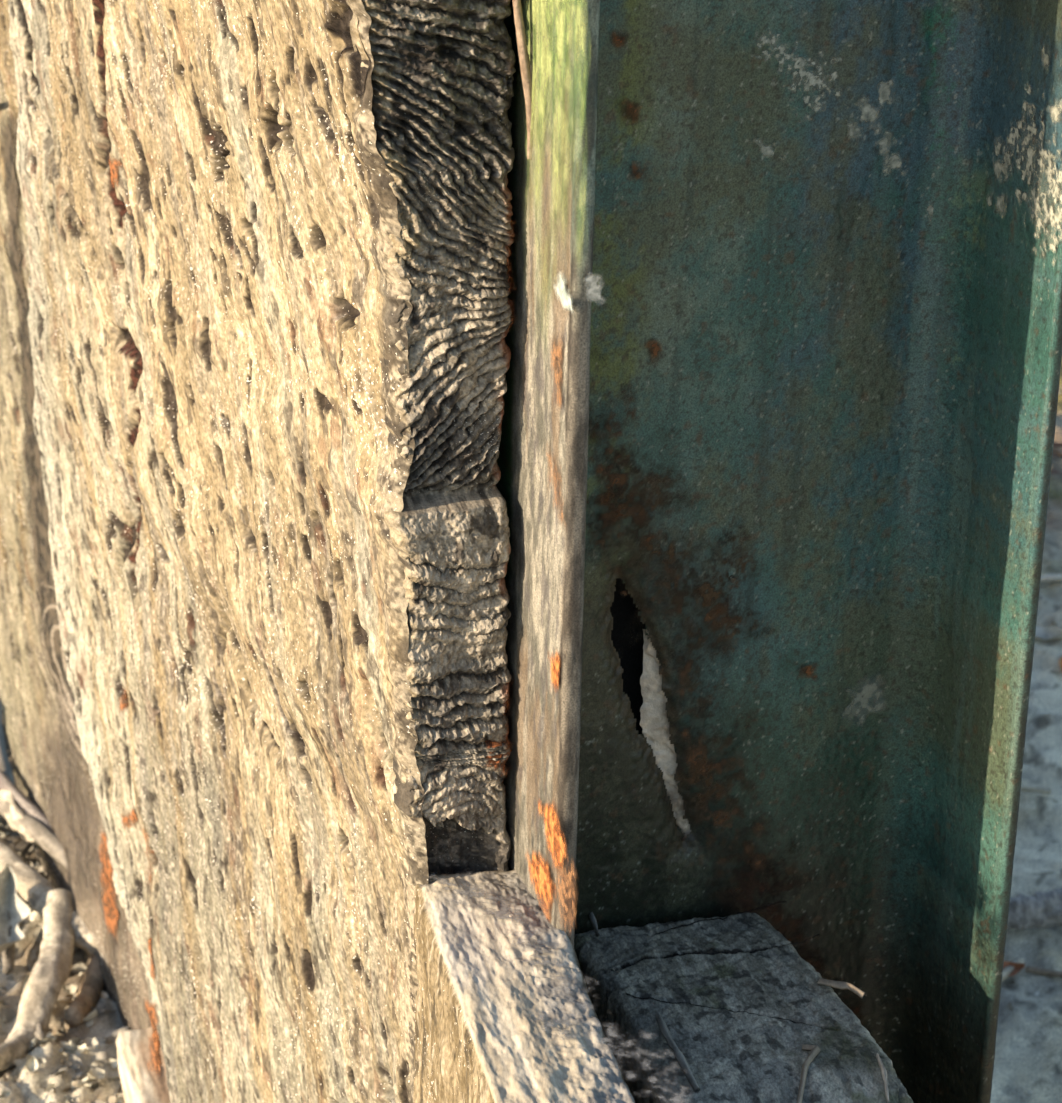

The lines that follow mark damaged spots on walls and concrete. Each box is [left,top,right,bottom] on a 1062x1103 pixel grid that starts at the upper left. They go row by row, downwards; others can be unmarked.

corrosion [99,834,119,932]
corrosion [528,802,575,925]
crack [611,901,833,1030]